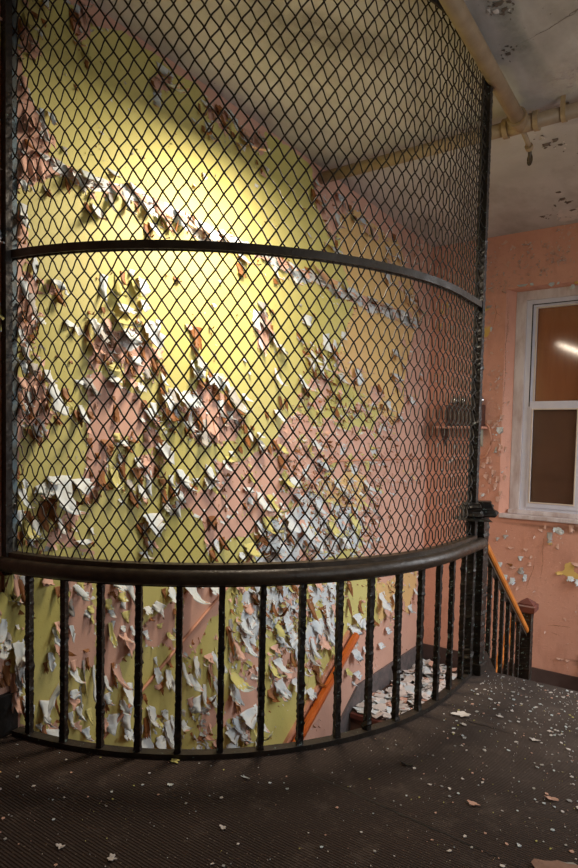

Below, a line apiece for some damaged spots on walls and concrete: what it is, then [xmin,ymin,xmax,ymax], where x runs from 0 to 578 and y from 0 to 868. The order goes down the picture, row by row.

peeling [15,0,429,563]
peeling [496,535,532,590]
peeling [538,524,578,549]
peeling [555,562,578,586]
peeling [0,571,418,749]